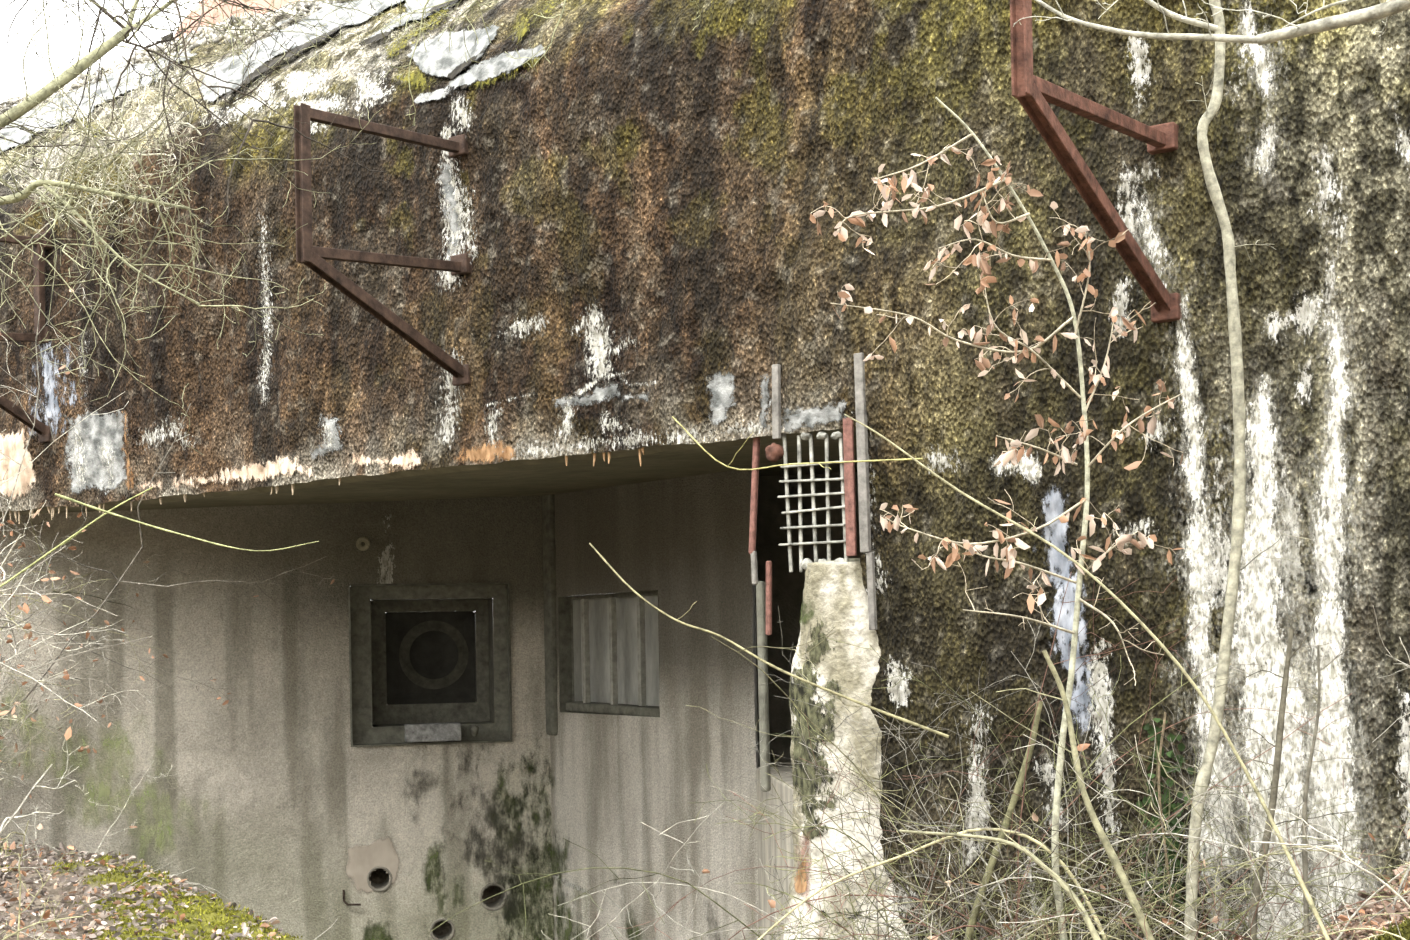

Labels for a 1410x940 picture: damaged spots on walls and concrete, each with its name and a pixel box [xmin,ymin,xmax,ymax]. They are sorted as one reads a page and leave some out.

peeling [0,51,197,153]
peeling [200,0,456,134]
peeling [406,25,545,104]
efflorescence [1126,36,1156,108]
efflorescence [433,94,478,290]
efflorescence [435,349,465,449]
efflorescence [572,299,635,388]
leakage [484,407,770,460]
efflorescence [1117,144,1369,940]
leakage [1033,487,1123,851]
efflorescence [1394,684,1410,866]
leakage [465,756,592,940]